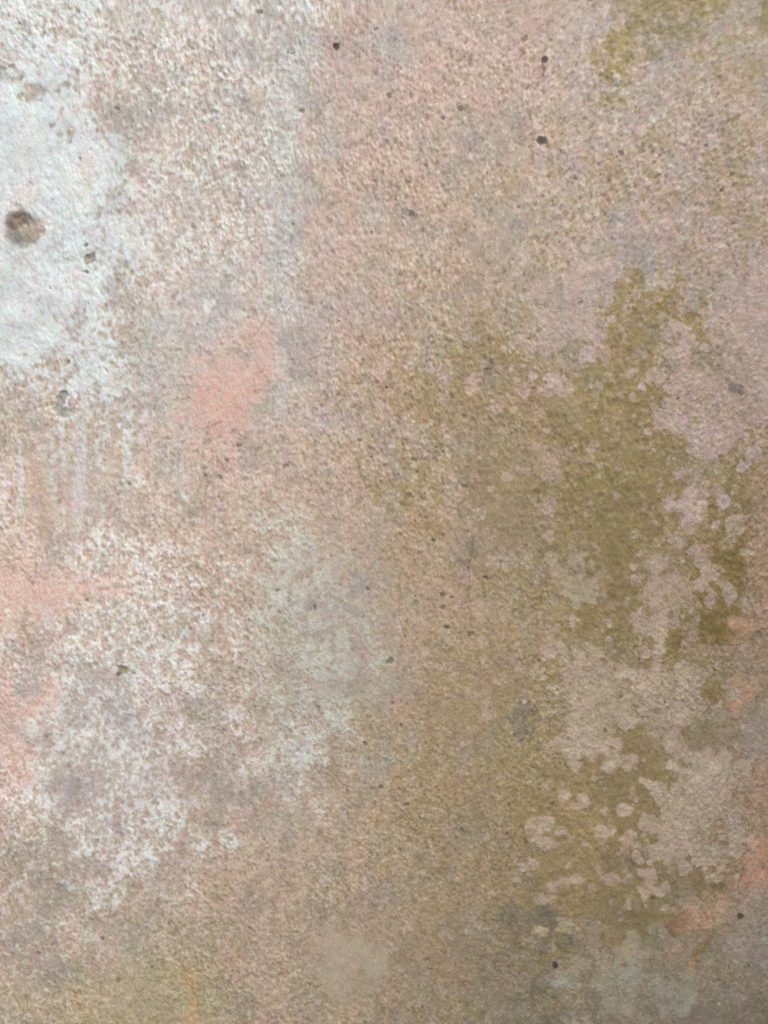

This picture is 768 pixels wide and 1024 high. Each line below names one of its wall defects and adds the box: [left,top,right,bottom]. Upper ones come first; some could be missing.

leakage [724,377,747,396]
leakage [722,882,768,978]